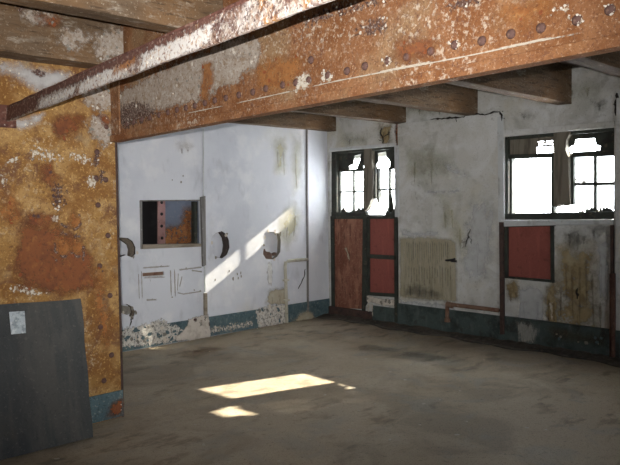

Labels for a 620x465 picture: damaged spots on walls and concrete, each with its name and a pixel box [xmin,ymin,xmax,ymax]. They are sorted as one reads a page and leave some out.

rust [304,0,387,28]
rust [355,15,388,36]
rust [6,5,234,121]
peeling [120,21,261,126]
peeling [240,36,561,103]
rust [53,115,81,140]
crack [431,111,505,122]
rust [13,164,97,295]
spalling [263,230,281,261]
leakage [400,237,456,301]
leakage [545,248,597,327]
peeling [121,304,285,349]